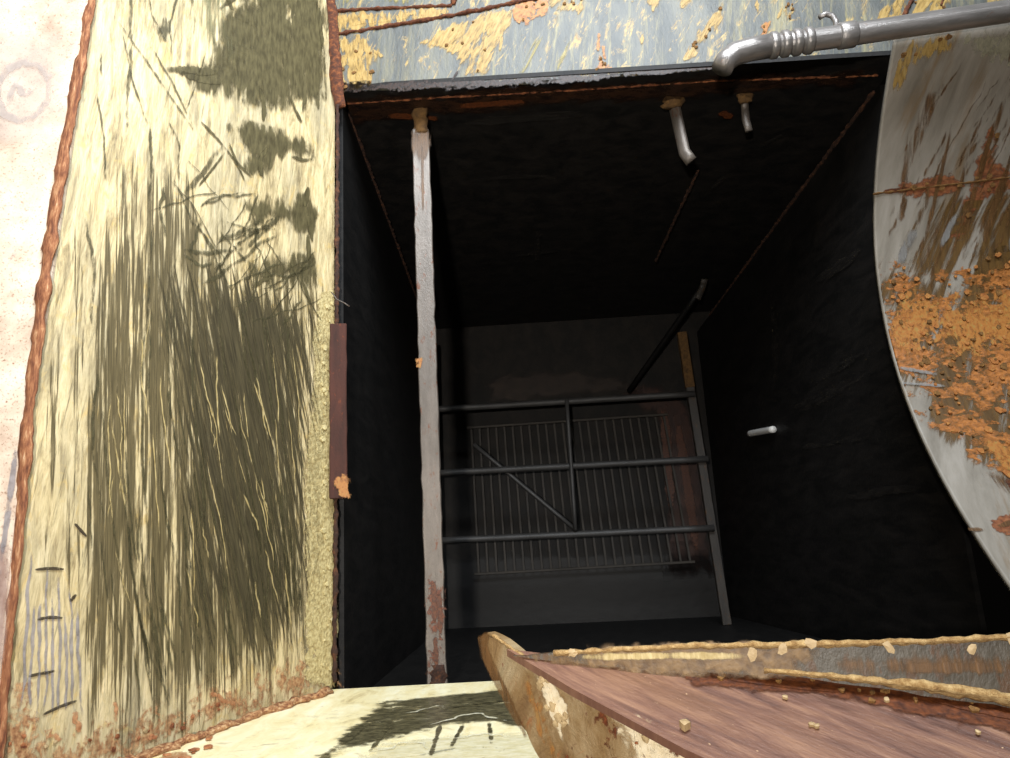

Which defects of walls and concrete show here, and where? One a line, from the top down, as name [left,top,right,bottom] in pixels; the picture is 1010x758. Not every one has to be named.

damp [316,2,325,58]
rust [877,0,949,19]
damp [97,98,106,171]
damp [123,0,321,462]
rust [334,474,350,498]
rust [0,459,17,660]
rust [969,515,1010,535]
rust [427,579,446,668]
rust [5,660,325,758]
damp [320,723,370,758]
damp [367,723,539,758]
rust [551,641,1010,733]